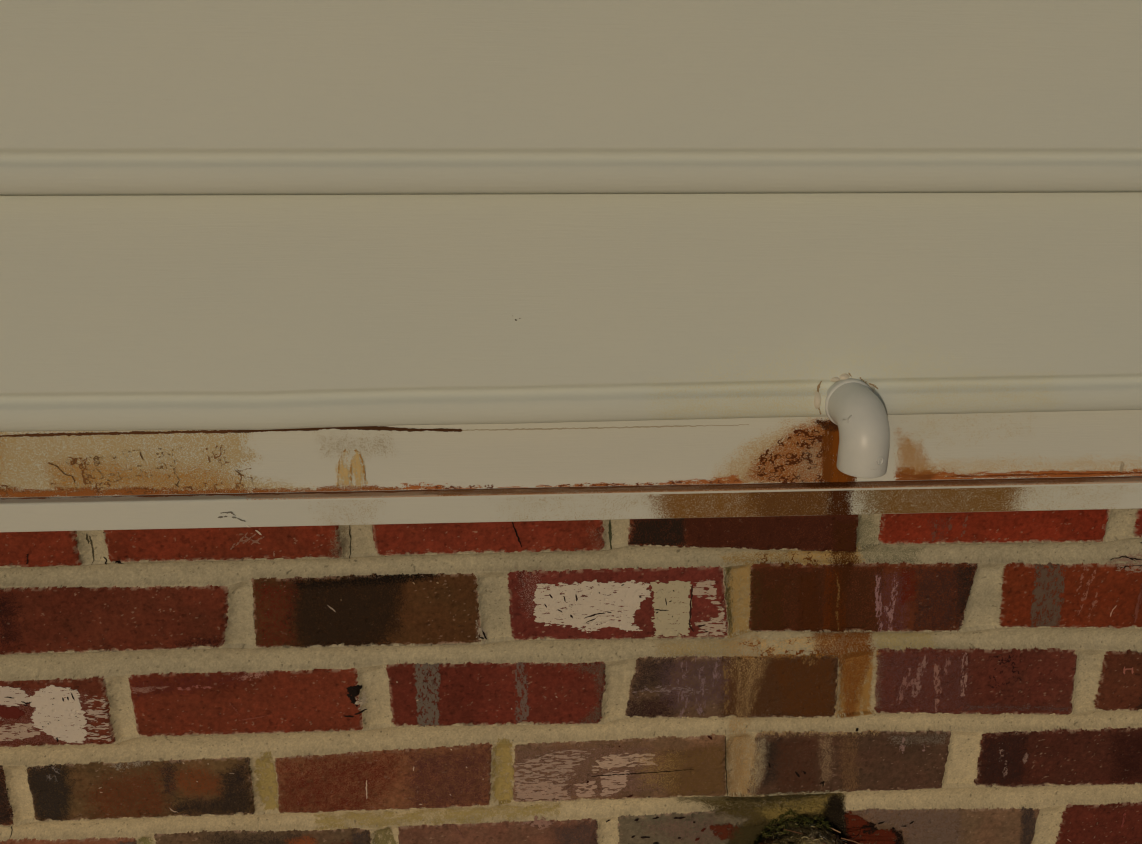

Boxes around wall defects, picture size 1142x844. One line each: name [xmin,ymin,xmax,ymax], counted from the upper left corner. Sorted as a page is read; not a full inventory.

water stain [0,430,396,560]
corrosion [0,407,1142,519]
corrosion [655,542,881,718]